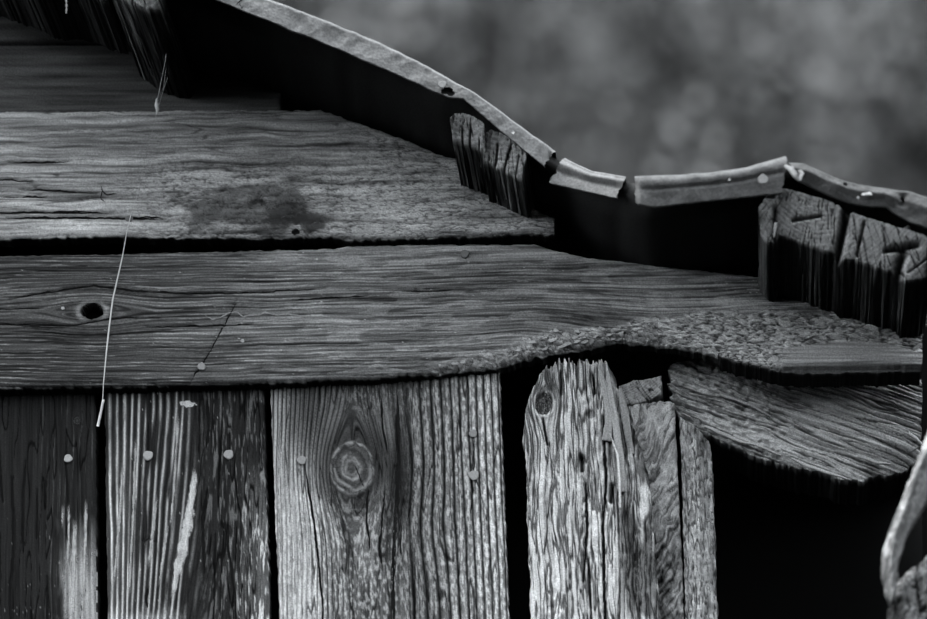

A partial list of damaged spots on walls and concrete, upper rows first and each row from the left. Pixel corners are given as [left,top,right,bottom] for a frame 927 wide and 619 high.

crack [0,285,363,384]
crack [0,433,69,619]
crack [198,401,237,619]
crack [305,469,324,619]